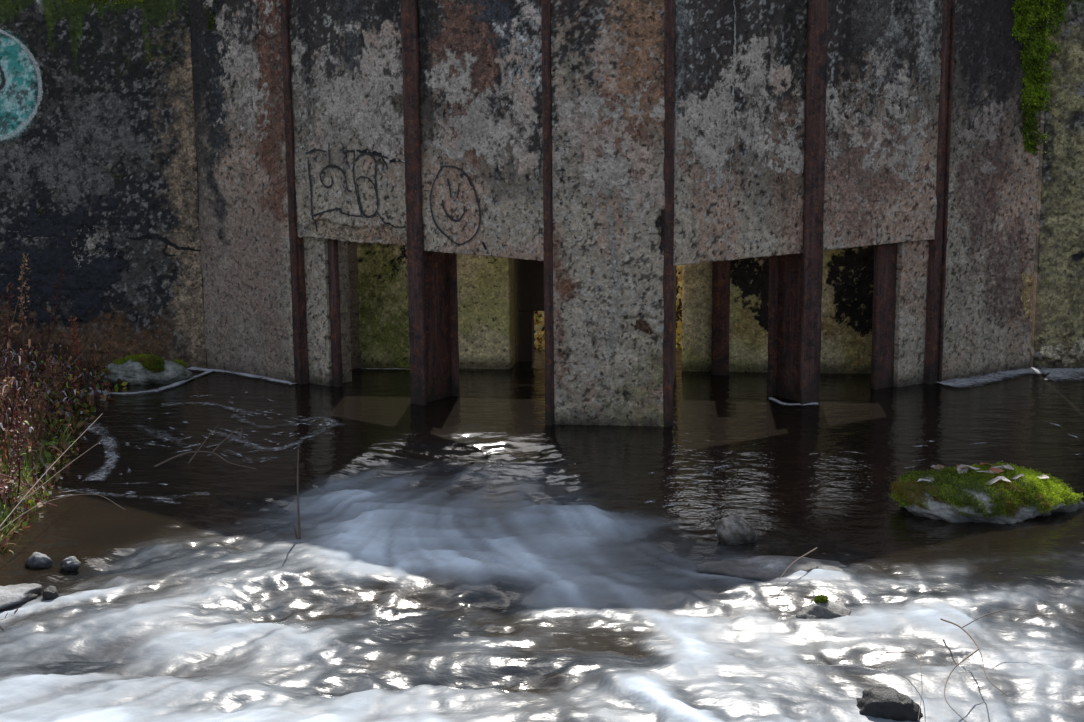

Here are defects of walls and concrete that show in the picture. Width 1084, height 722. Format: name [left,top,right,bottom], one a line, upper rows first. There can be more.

water stain [160,0,231,358]
rust [256,0,288,219]
rust [428,0,497,138]
rust [598,0,664,176]
water stain [852,0,940,89]